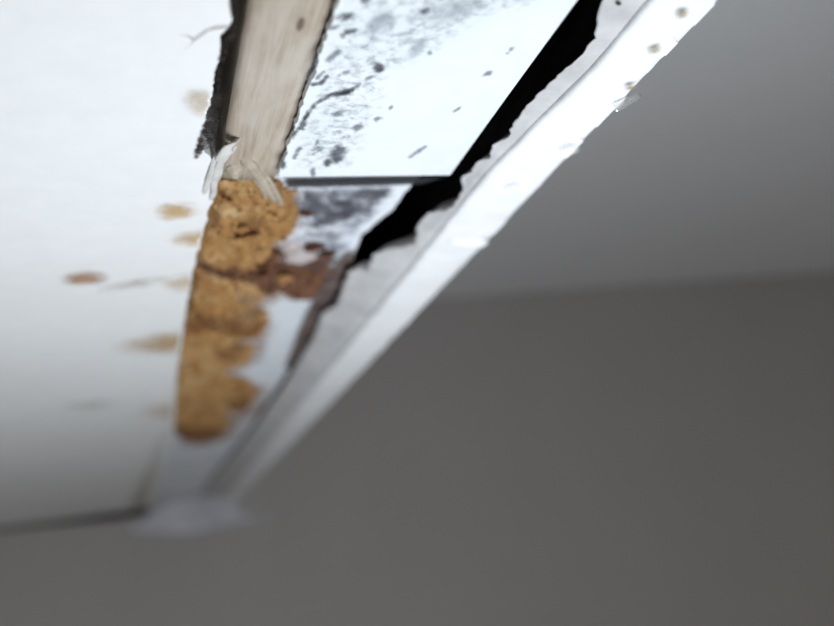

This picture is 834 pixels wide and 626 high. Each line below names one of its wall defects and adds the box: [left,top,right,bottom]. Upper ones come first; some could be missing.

corrosion [69,275,101,284]
corrosion [144,338,179,350]
corrosion [164,206,188,217]
corrosion [195,244,353,368]
water stain [284,178,440,263]
flaking render [203,0,646,499]